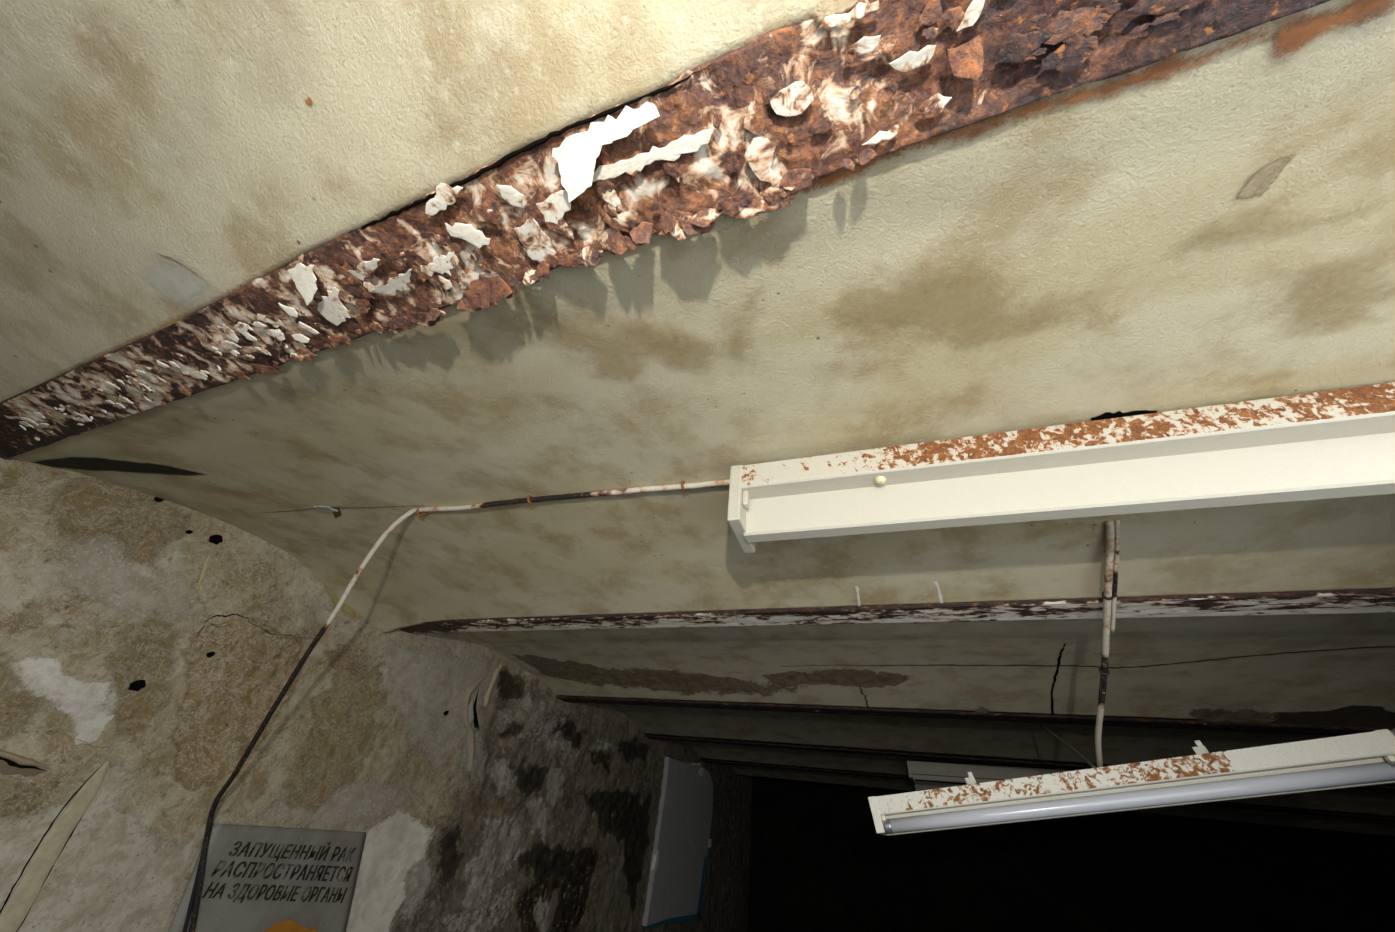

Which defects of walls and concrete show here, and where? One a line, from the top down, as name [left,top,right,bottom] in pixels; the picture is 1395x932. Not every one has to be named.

peeling [770,81,814,116]
peeling [812,0,880,29]
peeling [849,35,881,55]
peeling [862,123,901,145]
peeling [889,45,936,72]
peeling [957,0,985,31]
peeling [496,102,713,263]
corrosion [233,0,1395,380]
peeling [348,183,490,296]
leakage [45,478,302,791]
peeling [7,656,146,745]
leakage [264,641,663,932]